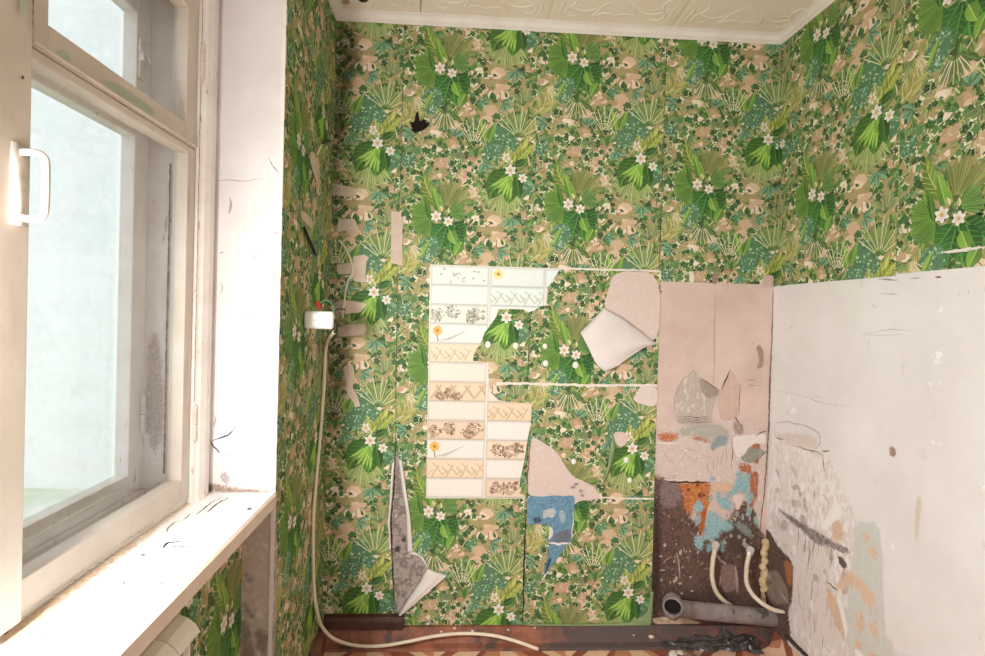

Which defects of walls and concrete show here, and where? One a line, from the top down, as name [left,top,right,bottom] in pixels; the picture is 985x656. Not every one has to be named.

hole [410,111,428,132]
peeling [210,426,238,456]
flaking render [693,417,896,656]